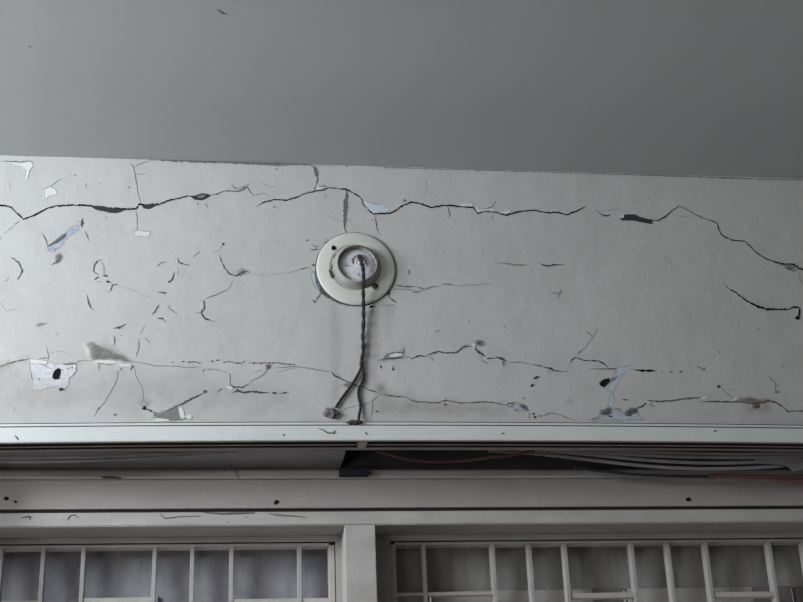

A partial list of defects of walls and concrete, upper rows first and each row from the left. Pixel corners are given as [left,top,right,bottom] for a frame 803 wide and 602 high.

peeling [0,160,34,180]
peeling [42,218,84,265]
crack [0,160,803,285]
crack [723,284,801,320]
flaking render [28,345,84,391]
crack [87,243,505,417]
crack [378,329,705,373]
flaking render [591,366,643,421]
crack [636,375,803,412]